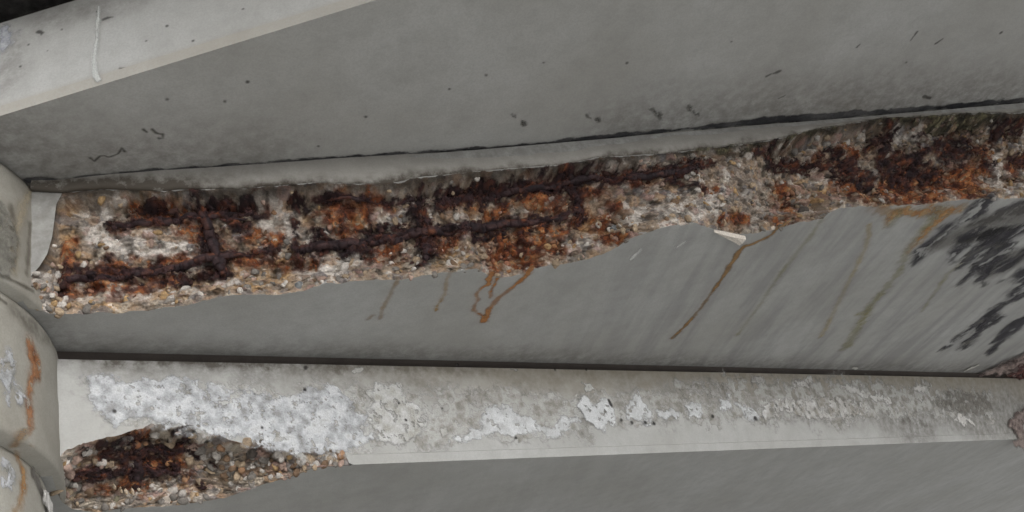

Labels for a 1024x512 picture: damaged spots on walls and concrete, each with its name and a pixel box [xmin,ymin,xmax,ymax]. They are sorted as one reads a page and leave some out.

rust [473,266,534,323]
spalling [30,112,1024,319]
rust [671,220,791,339]
rust [881,204,962,245]
water stain [913,191,1024,372]
rust [13,338,40,504]
spalling [43,373,428,512]
water stain [171,367,996,459]